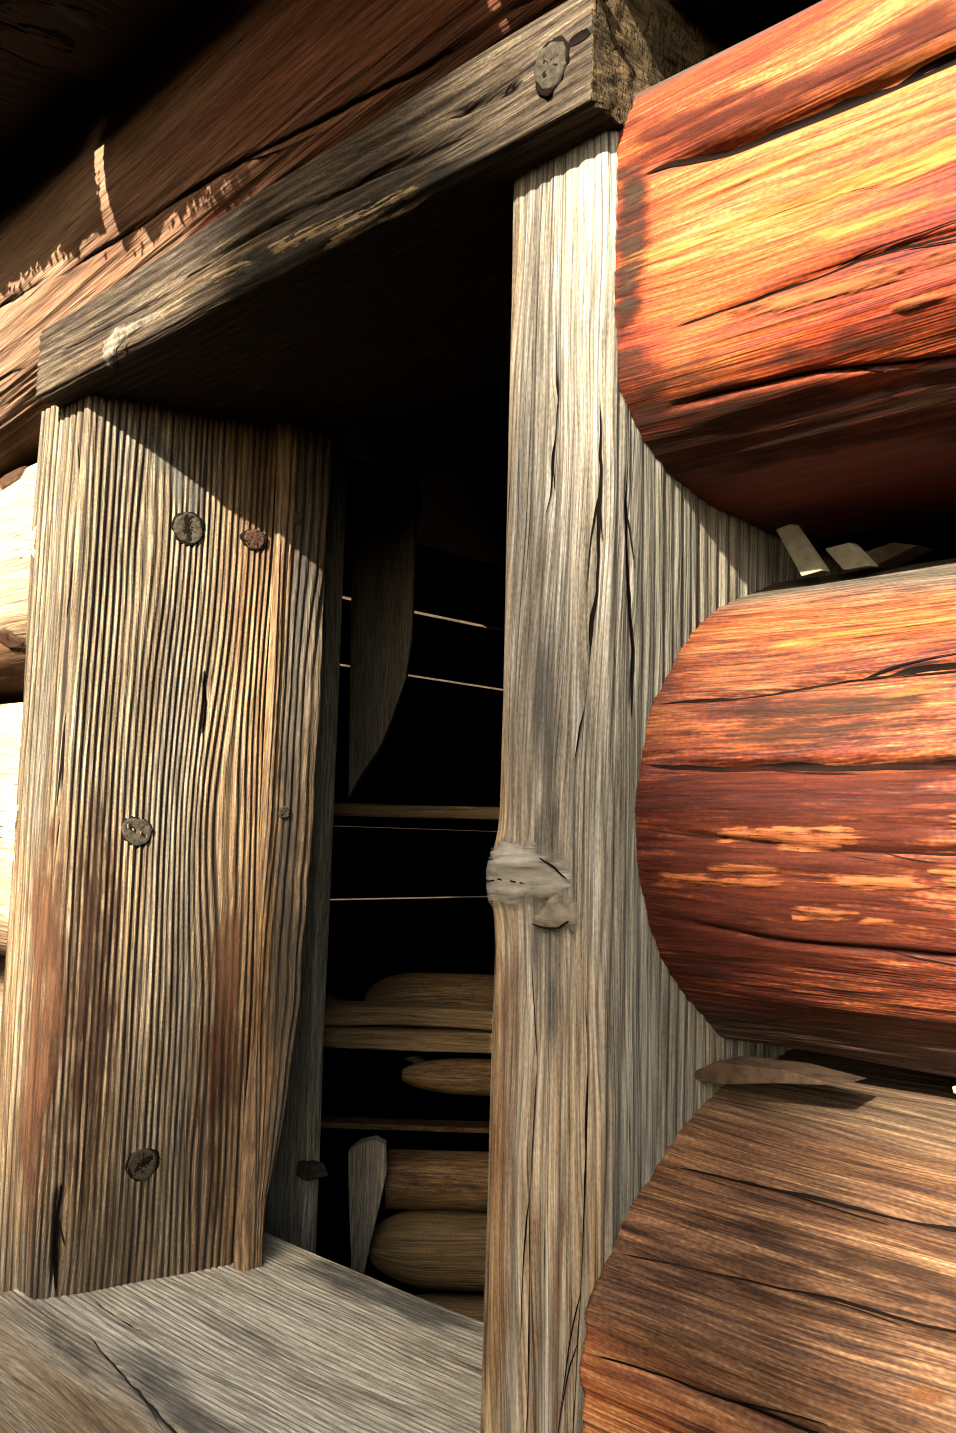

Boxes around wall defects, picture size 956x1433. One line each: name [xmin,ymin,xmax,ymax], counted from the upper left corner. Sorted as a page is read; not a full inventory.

crack [569,28,589,46]
crack [0,0,533,351]
crack [642,51,956,176]
crack [694,165,924,239]
crack [545,376,558,517]
crack [573,410,956,766]
crack [647,759,956,777]
crack [520,971,827,1433]
crack [669,1166,956,1232]
crack [618,1253,956,1333]
crack [86,1301,177,1433]